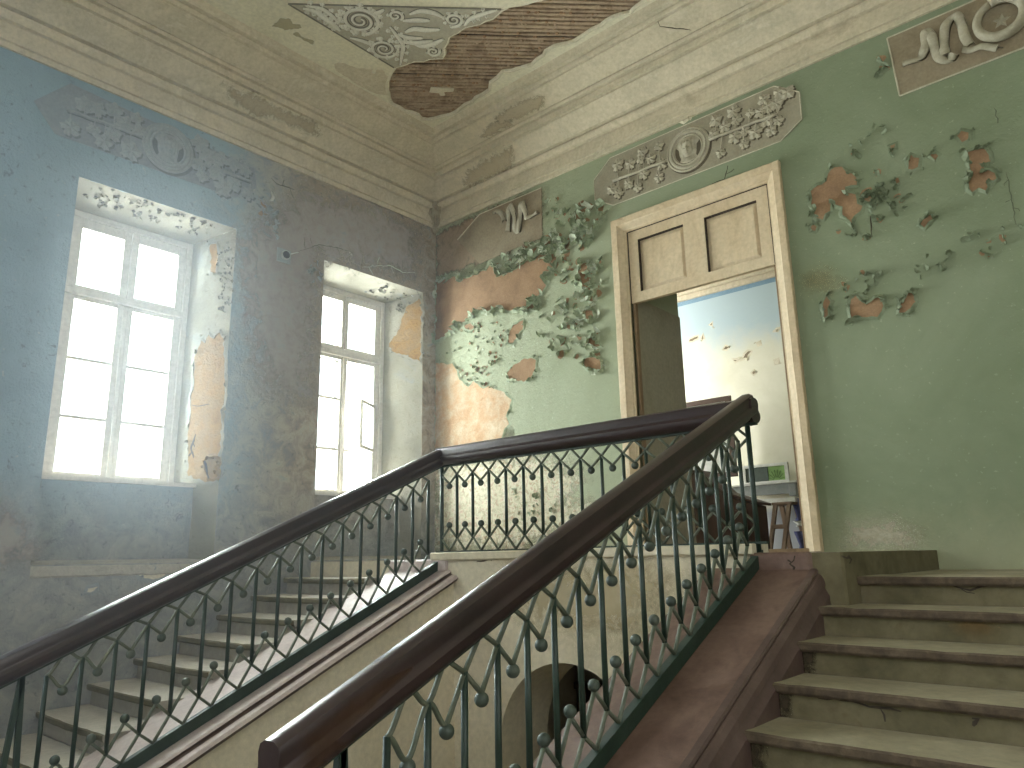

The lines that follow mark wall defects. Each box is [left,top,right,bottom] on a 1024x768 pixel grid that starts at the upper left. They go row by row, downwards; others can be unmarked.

flaking render [332,0,649,121]
peeling [805,122,942,241]
peeling [949,127,1003,196]
peeling [83,187,236,313]
peeling [364,197,609,451]
peeling [818,224,1023,326]
flaking render [184,328,228,485]